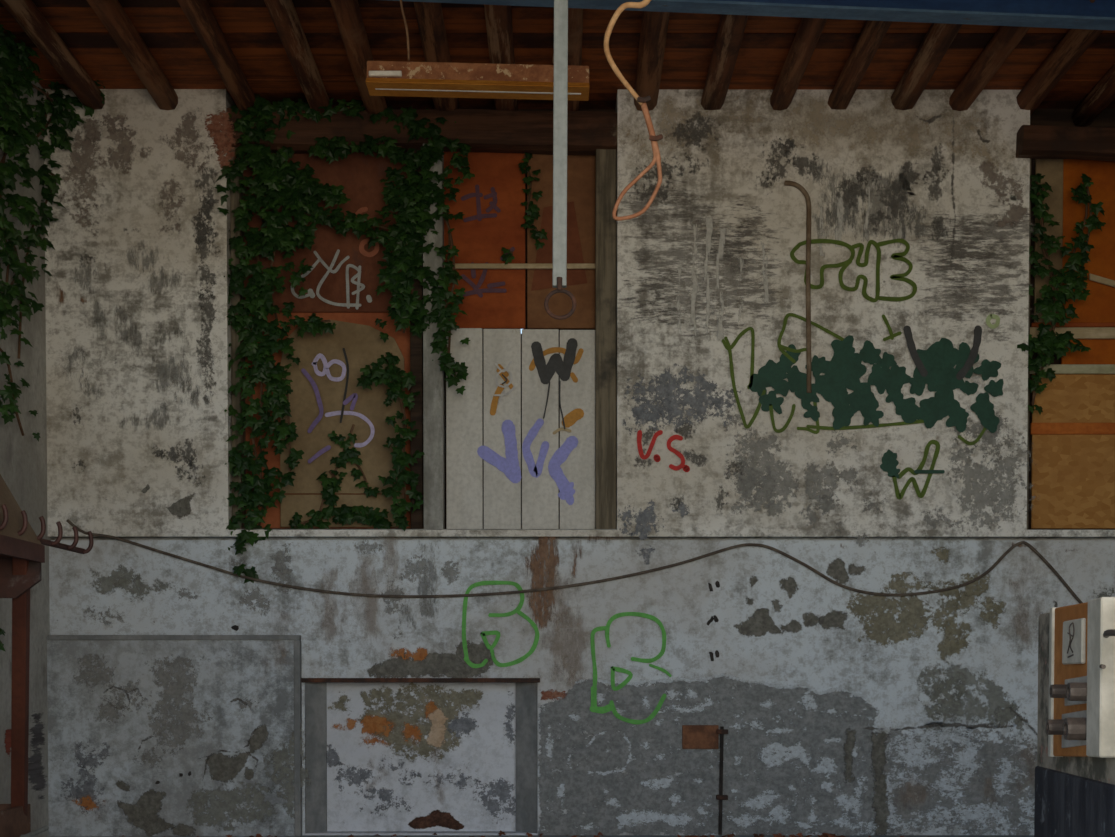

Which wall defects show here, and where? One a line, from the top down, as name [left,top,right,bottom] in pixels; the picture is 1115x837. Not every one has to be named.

flaking render [426,708,448,747]
spalling [408,810,464,830]